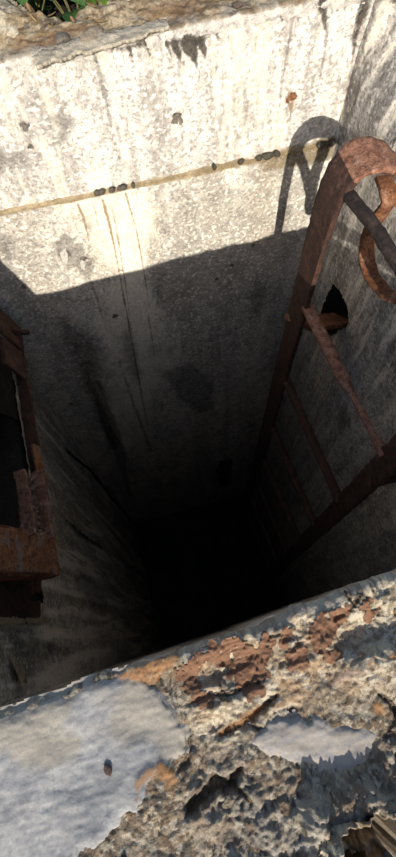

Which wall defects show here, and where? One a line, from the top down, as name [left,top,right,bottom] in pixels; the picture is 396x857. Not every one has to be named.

damp [159,34,207,65]
hole [321,284,349,337]
peeling [173,597,381,710]
crack [191,681,277,737]
crack [177,731,192,771]
crack [187,767,253,812]
spalling [319,813,396,857]